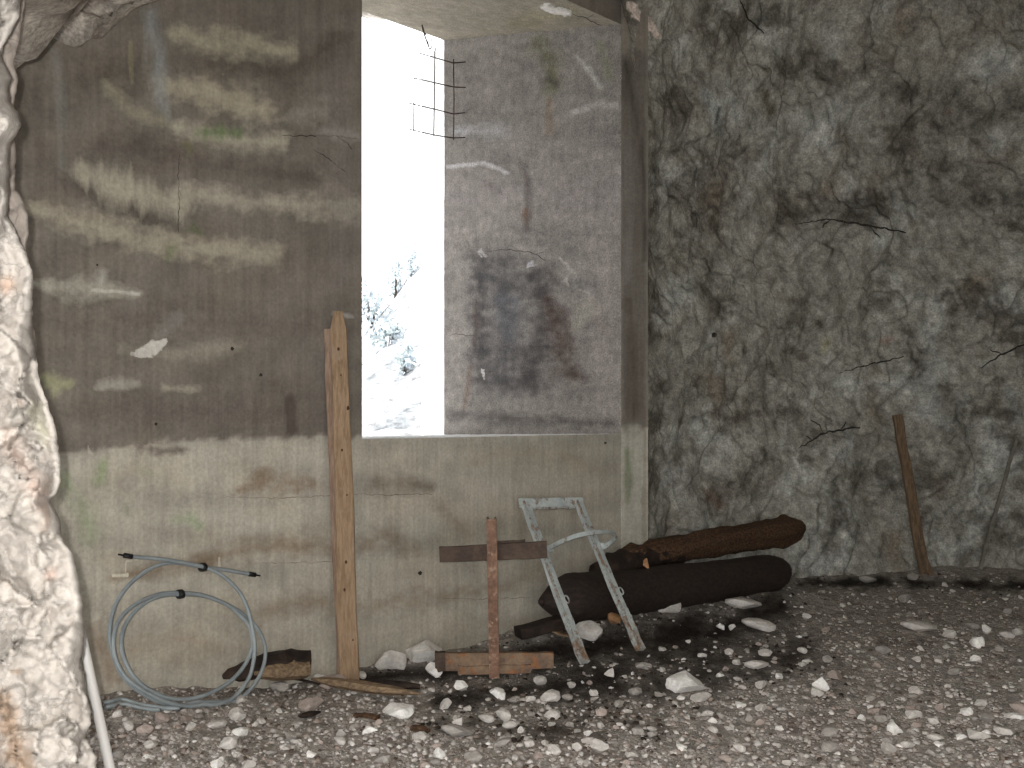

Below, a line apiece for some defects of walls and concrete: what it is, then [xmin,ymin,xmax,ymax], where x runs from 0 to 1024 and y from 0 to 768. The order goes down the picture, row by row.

crack [740,0,764,34]
water stain [99,3,361,157]
spalling [408,44,466,140]
water stain [21,44,361,309]
crack [799,218,906,238]
water stain [446,31,662,544]
spalling [130,338,168,358]
water stain [114,308,247,366]
crack [838,356,904,374]
crack [981,344,1024,368]
water stain [38,369,77,400]
crack [799,420,860,448]